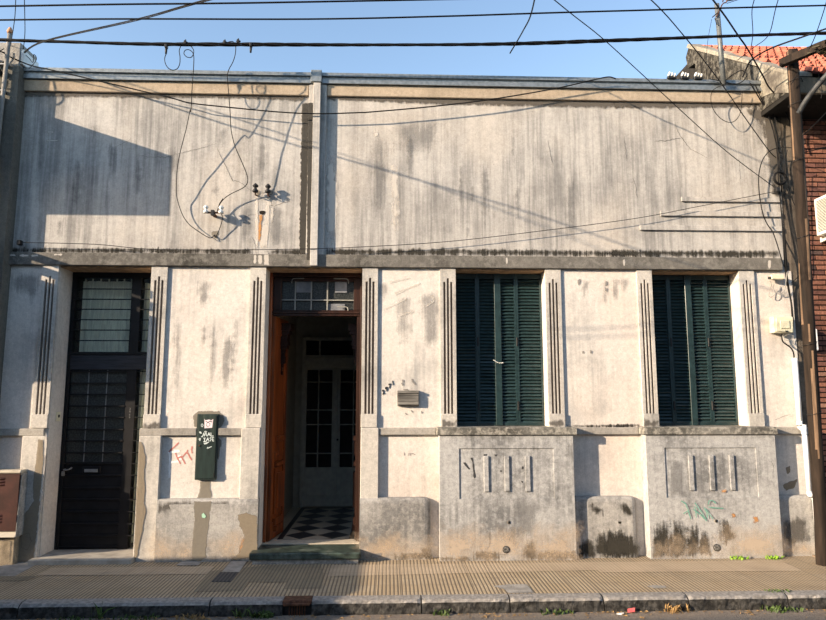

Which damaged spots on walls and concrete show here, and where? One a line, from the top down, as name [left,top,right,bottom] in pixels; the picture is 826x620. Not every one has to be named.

leakage [328,97,783,196]
leakage [10,92,313,265]
leakage [326,159,338,233]
leakage [392,172,400,224]
flaking render [232,513,258,560]
leakage [442,530,639,561]
leakage [653,523,711,557]
leakage [784,517,807,551]